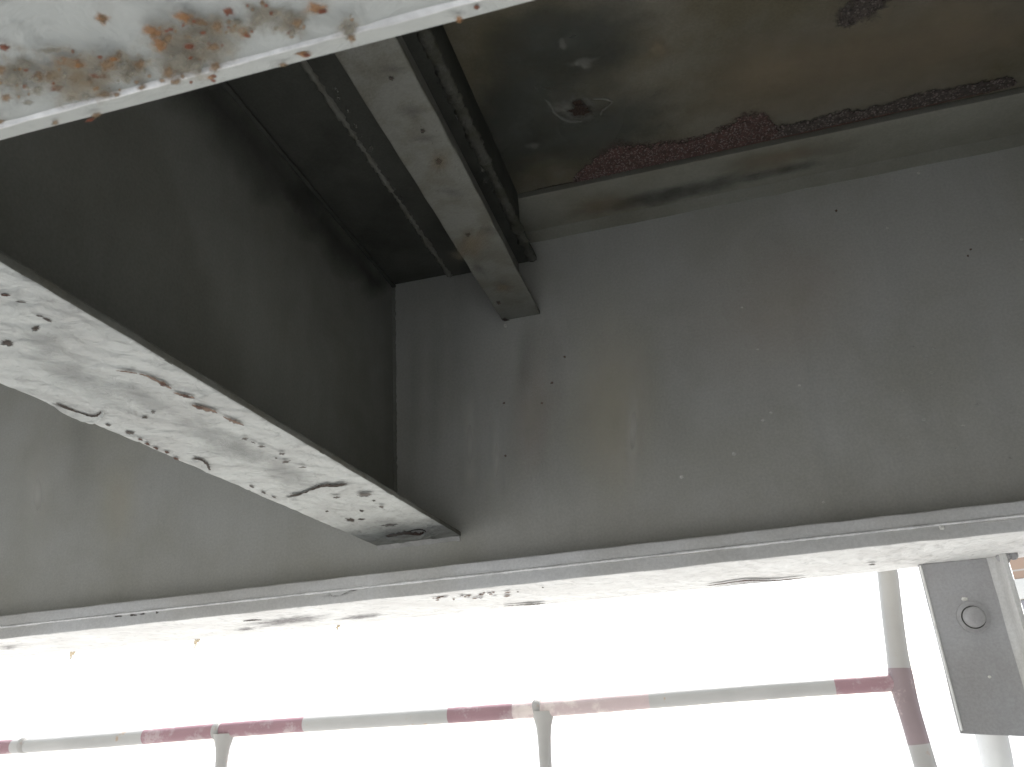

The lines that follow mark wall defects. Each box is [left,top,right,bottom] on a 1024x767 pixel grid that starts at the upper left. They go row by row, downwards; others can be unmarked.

rust [339,14,357,41]
rust [0,0,327,105]
peeling [52,403,111,427]
peeling [192,458,211,473]
peeling [250,483,383,508]